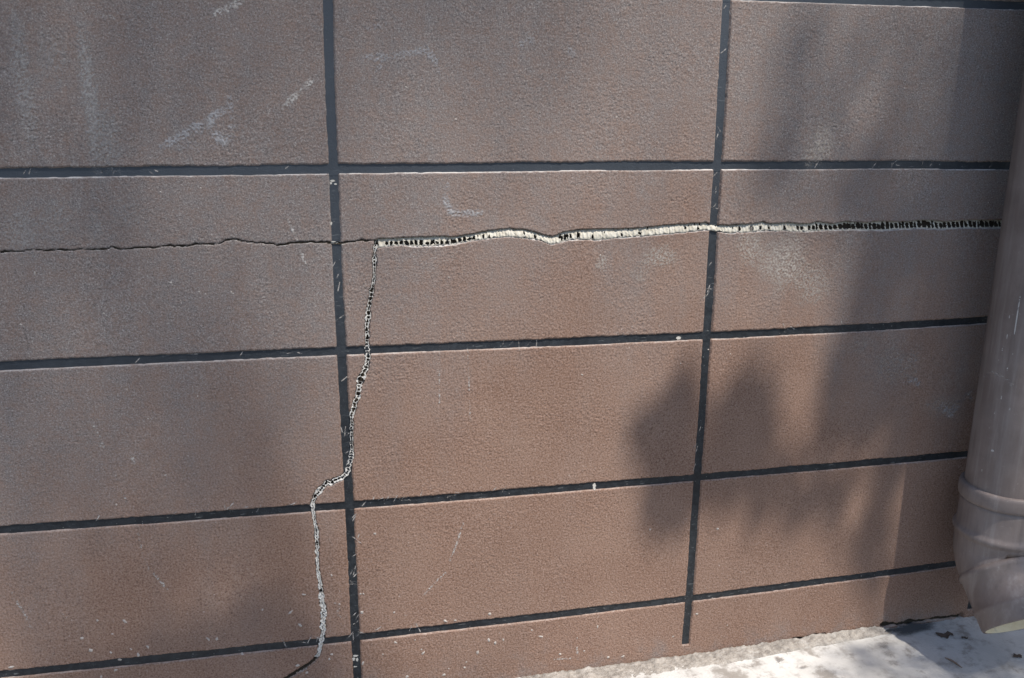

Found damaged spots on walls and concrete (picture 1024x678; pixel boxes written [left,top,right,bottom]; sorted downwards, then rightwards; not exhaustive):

crack [0,220,1002,678]